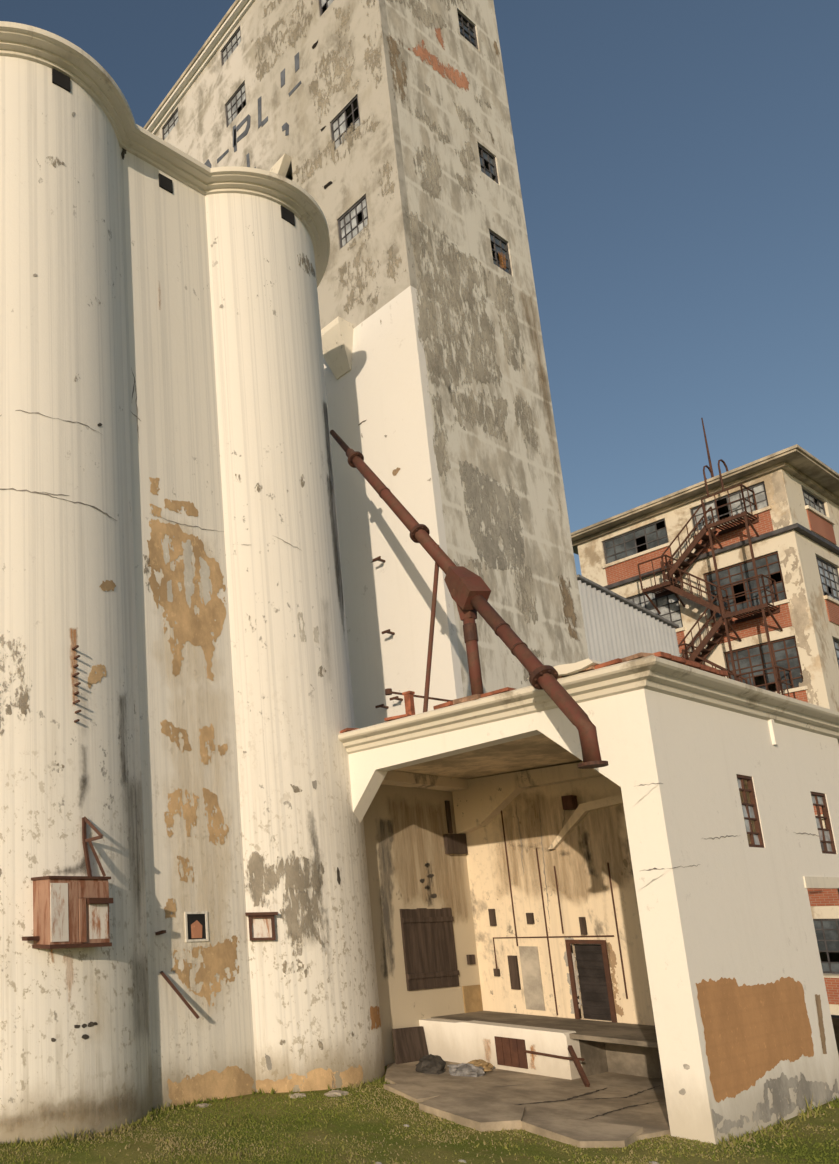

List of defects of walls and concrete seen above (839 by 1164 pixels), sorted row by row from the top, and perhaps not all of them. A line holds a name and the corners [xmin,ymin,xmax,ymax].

peeling [251,0,494,199]
peeling [143,477,226,681]
peeling [160,719,228,765]
peeling [177,856,194,883]
peeling [164,788,229,846]
leakage [503,797,592,896]
peeling [164,898,176,918]
peeling [171,935,239,1007]
spalling [167,1054,363,1106]
peeling [696,977,839,1136]